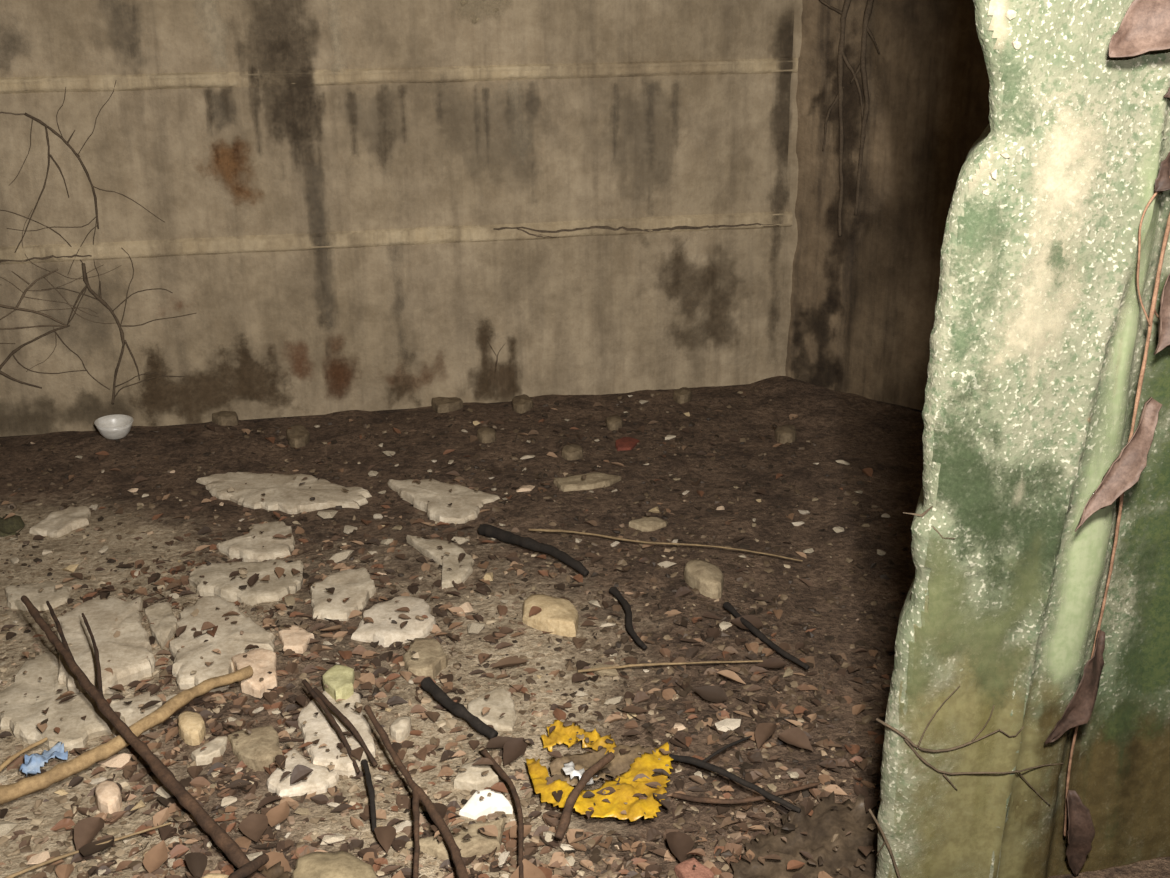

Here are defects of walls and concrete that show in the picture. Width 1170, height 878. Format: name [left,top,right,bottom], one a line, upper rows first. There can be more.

rust [214,143,252,199]
damp [250,0,321,139]
damp [309,166,332,325]
crack [493,223,780,238]
damp [773,21,794,156]
damp [814,46,864,258]
damp [996,113,1099,374]
damp [141,350,287,425]
rust [326,360,353,397]
damp [475,321,520,400]
damp [795,269,841,388]
damp [1024,703,1170,878]